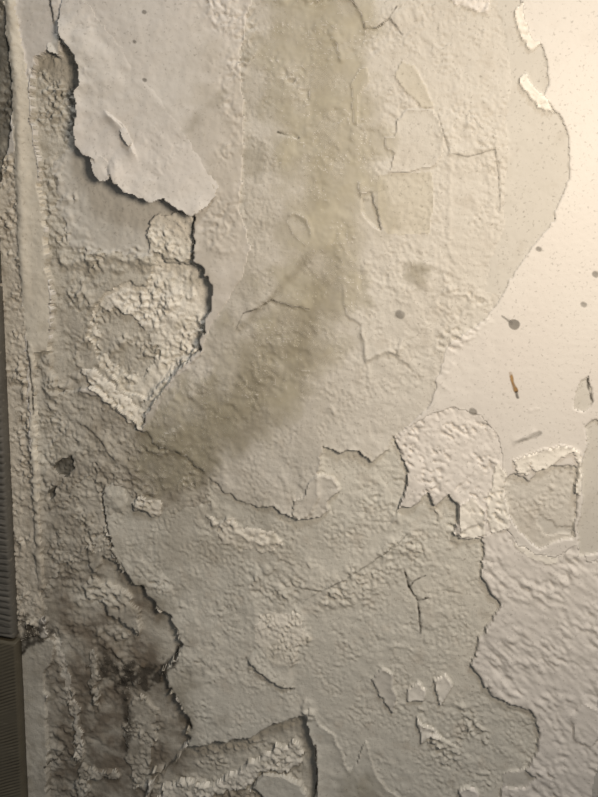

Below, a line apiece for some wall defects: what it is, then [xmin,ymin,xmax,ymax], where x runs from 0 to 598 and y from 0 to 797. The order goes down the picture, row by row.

water stain [261,0,380,261]
water stain [164,315,315,485]
peeling [14,0,582,586]
peeling [574,378,593,411]
water stain [98,644,181,752]
peeling [40,437,539,797]